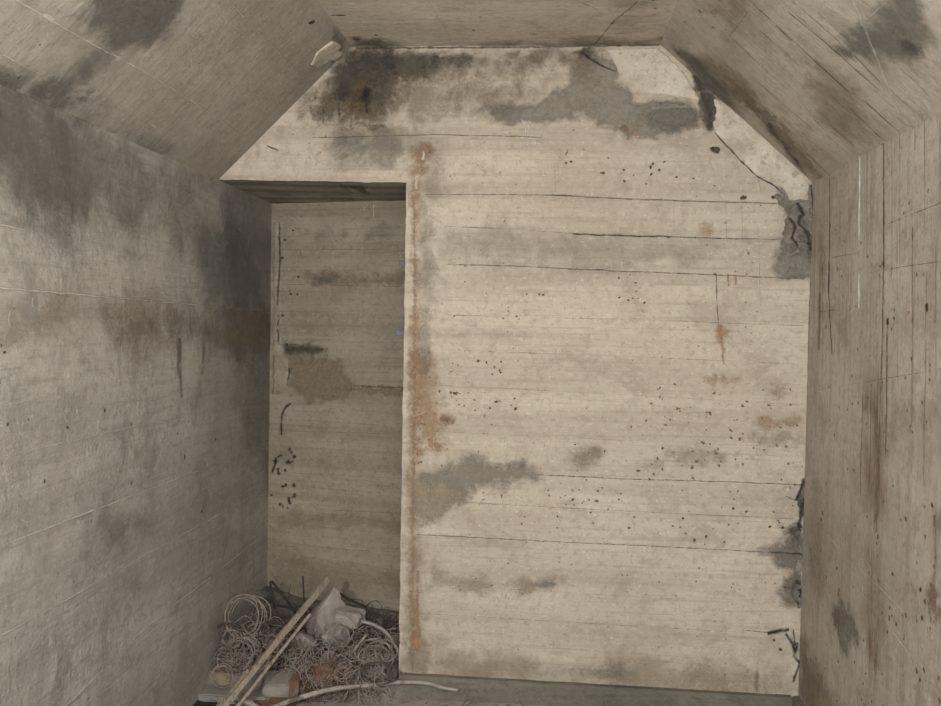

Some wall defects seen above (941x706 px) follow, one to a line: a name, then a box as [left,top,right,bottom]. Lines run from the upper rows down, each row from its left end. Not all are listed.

damp [89,0,182,49]
damp [837,0,925,60]
damp [310,37,662,159]
rust [412,143,434,204]
crack [425,190,516,198]
crack [550,133,785,204]
damp [677,52,820,278]
spalling [771,185,813,282]
damp [286,344,403,403]
rust [411,313,454,464]
damp [413,455,537,520]
spalling [786,477,805,531]